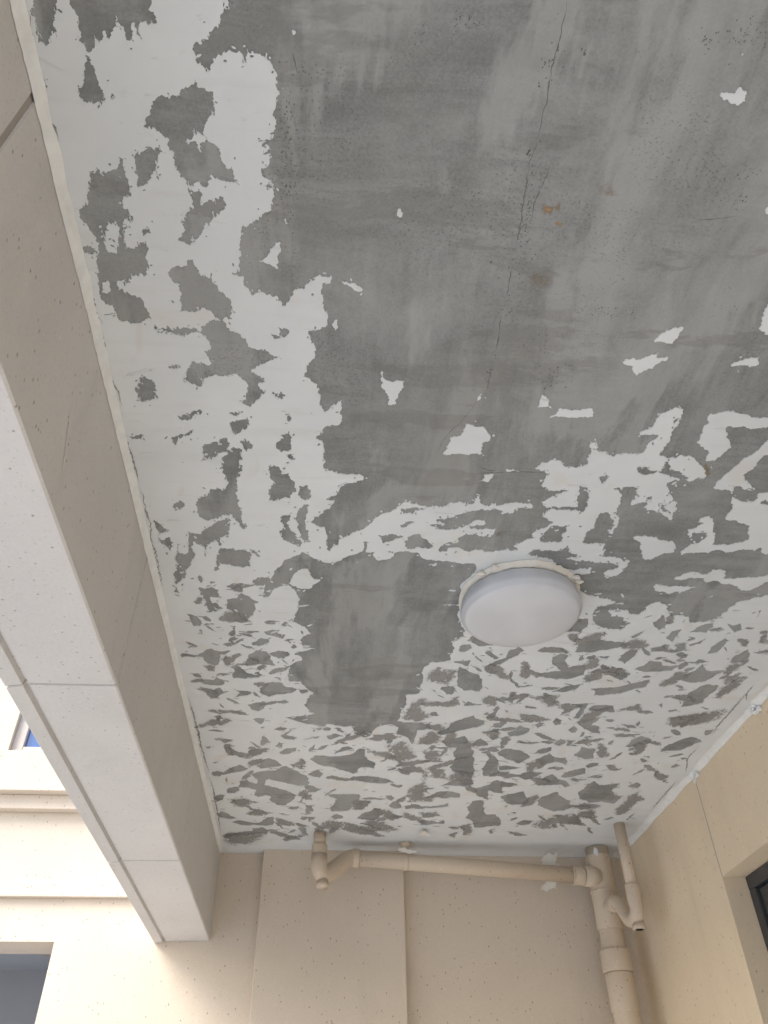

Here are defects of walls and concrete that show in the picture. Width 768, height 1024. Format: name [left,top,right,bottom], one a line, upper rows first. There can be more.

peeling [30,0,157,108]
peeling [79,0,768,844]
crack [435,0,568,454]